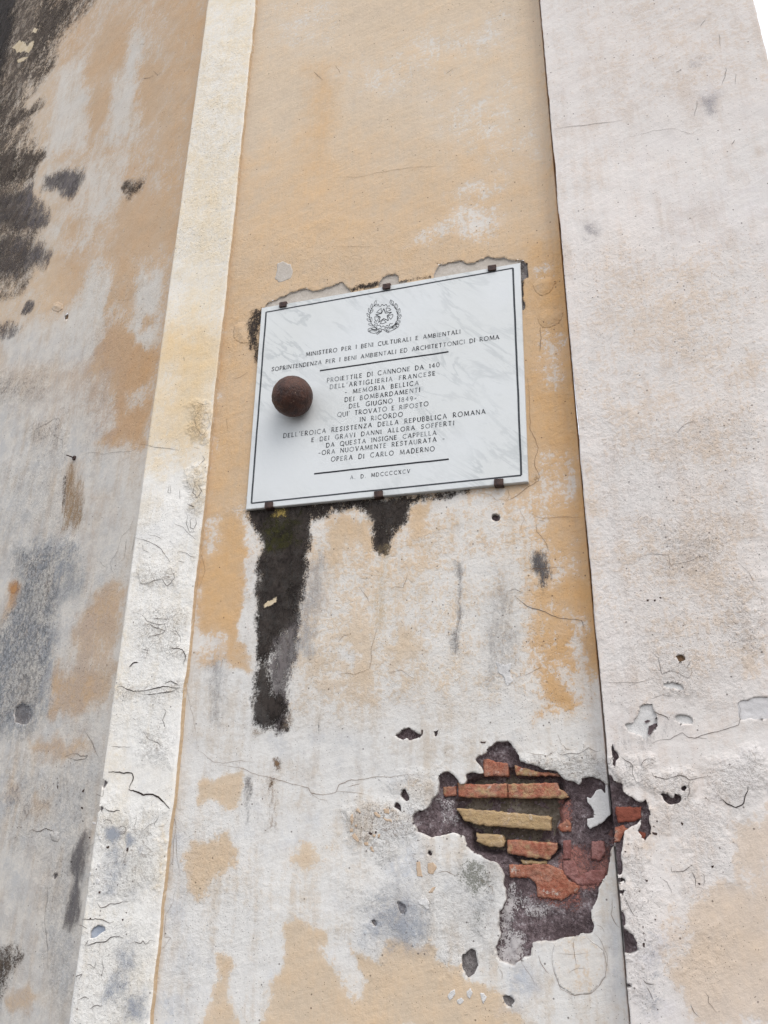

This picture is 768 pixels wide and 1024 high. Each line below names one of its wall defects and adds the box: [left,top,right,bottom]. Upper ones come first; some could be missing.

leakage [0,0,96,339]
flaking render [434,257,528,310]
crack [483,379,583,623]
leakage [246,489,470,735]
crack [67,736,179,866]
crack [119,614,415,800]
flaking render [403,741,658,964]
flaking render [625,704,658,740]
peeling [675,715,693,724]